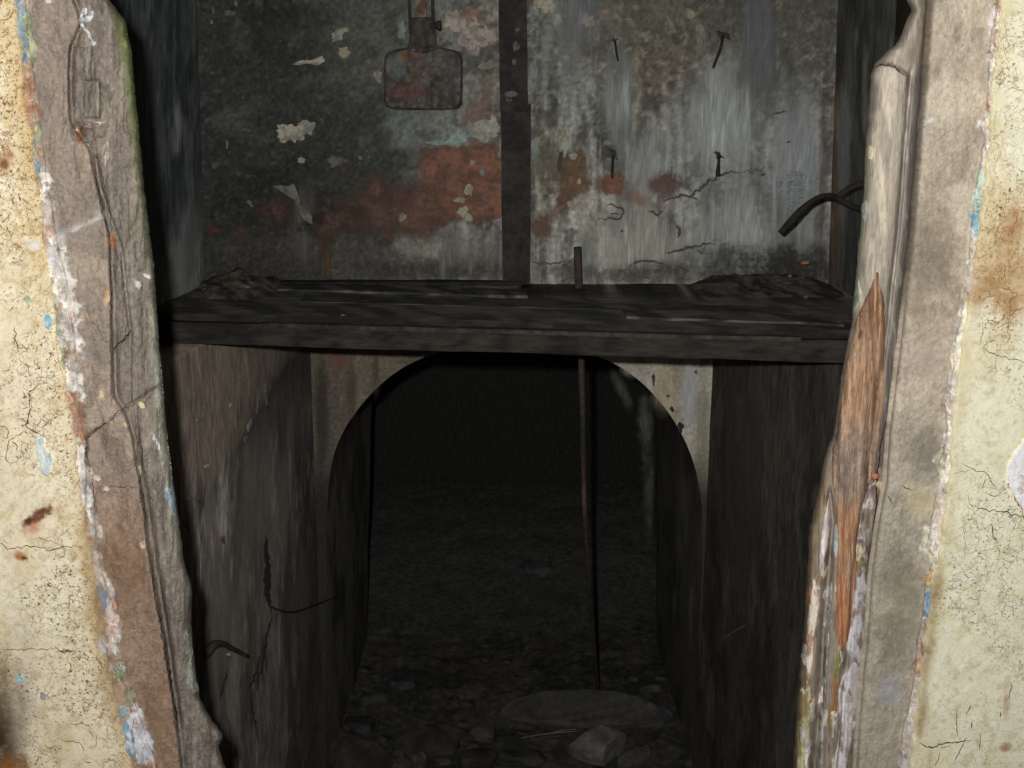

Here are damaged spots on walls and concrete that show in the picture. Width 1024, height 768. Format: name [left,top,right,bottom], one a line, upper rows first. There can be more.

crack [67,7,86,113]
peeling [331,28,351,58]
peeling [443,9,498,51]
crack [89,152,131,356]
peeling [246,96,502,246]
rust [596,174,623,194]
damp [581,203,687,280]
crack [603,167,766,278]
peeling [15,0,158,768]
rust [24,506,52,530]
peeling [805,524,838,632]
peeling [795,687,855,768]